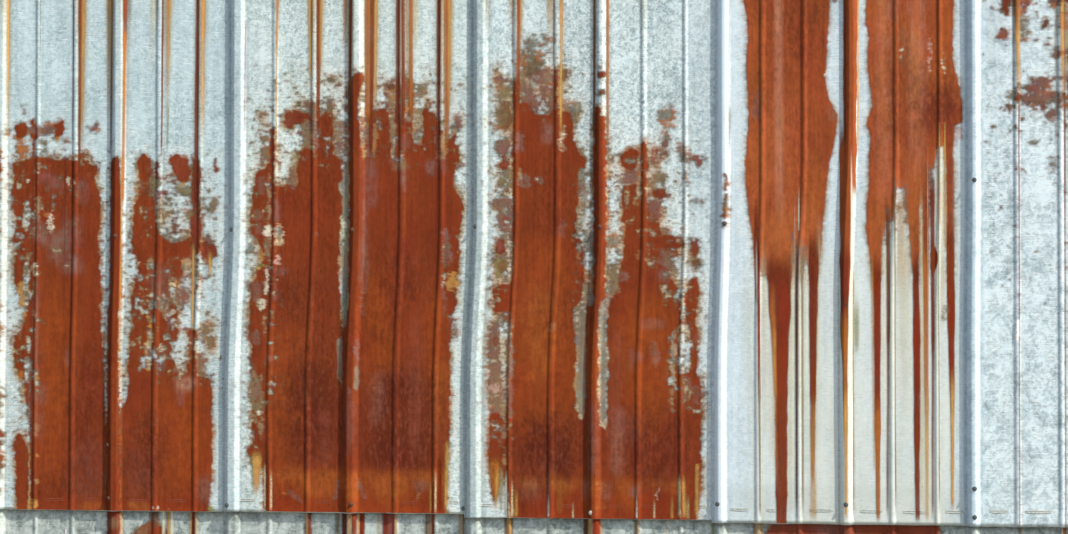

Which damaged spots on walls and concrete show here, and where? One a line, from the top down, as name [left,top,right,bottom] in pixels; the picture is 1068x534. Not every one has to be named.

corrosion [0,0,218,534]
corrosion [245,0,465,534]
corrosion [485,0,707,534]
corrosion [743,0,963,534]
corrosion [991,0,1068,407]